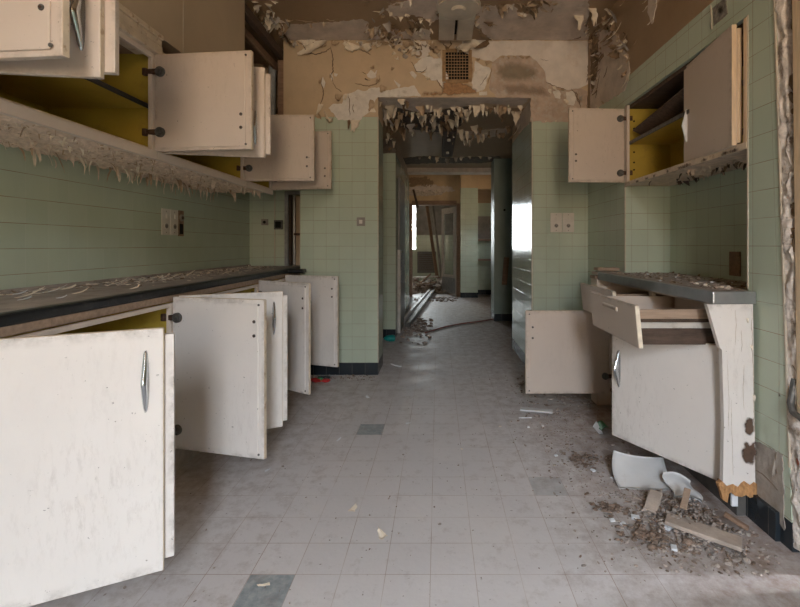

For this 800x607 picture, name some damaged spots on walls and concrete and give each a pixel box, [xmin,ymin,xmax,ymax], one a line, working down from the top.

peeling [251,0,637,165]
peeling [642,0,659,25]